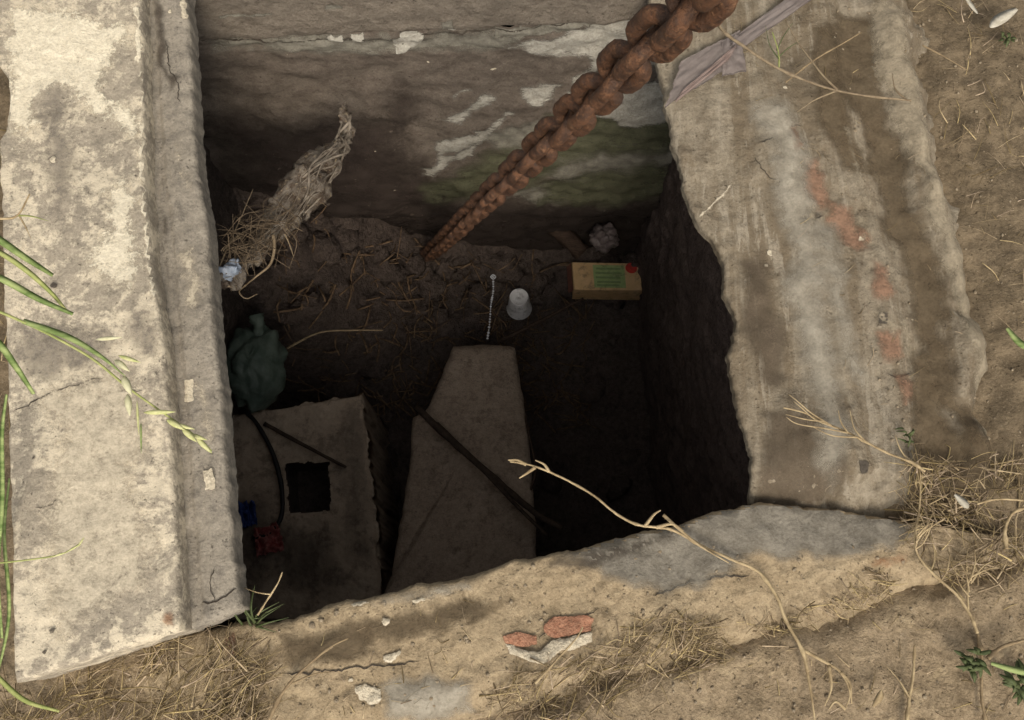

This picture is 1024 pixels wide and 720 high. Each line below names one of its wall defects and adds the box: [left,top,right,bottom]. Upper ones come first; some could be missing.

damp [218,98,513,238]
damp [457,116,670,257]
crack [14,378,99,411]
crack [653,574,749,596]
spalling [503,615,594,664]
crack [284,661,417,675]